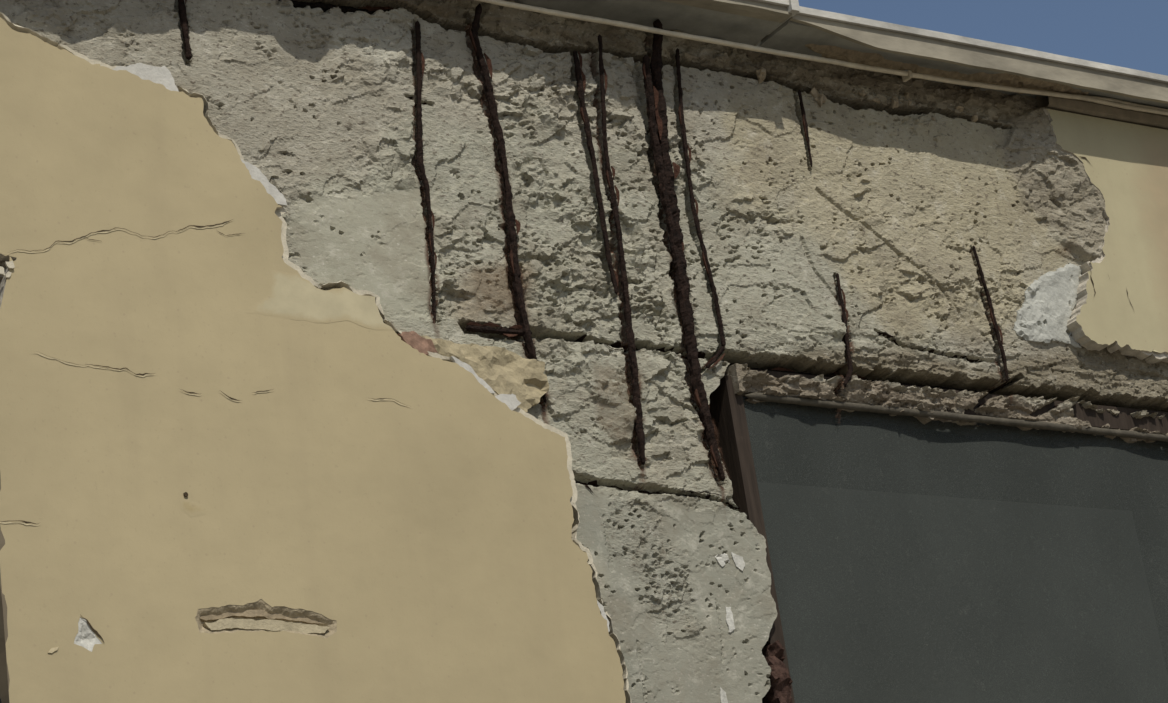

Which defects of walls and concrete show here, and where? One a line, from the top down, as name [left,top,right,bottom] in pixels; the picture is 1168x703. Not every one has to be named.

crack [31,351,156,377]
crack [9,219,241,254]
crack [179,389,273,402]
spalling [0,0,793,703]
corrosion [412,21,438,322]
corrosion [465,3,538,361]
corrosion [573,35,646,472]
crack [575,480,740,510]
corrosion [642,19,733,502]
corrosion [798,90,812,167]
corrosion [750,245,1009,394]
spalling [661,30,1168,443]